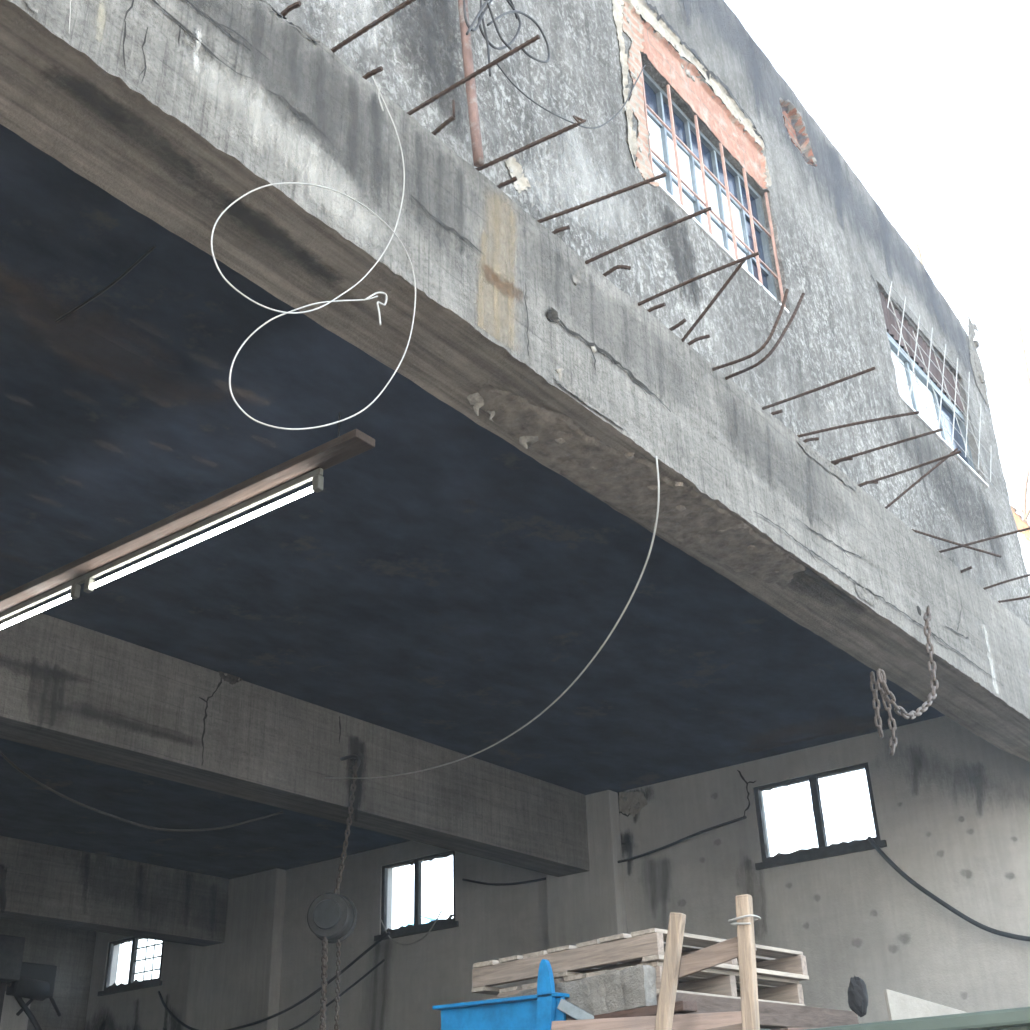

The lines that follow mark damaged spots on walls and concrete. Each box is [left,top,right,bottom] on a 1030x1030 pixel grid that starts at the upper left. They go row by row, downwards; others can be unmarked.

crack [123,0,333,145]
flaking render [536,0,772,234]
spalling [780,100,817,166]
rust [486,268,520,300]
spalling [573,206,712,286]
spalling [638,251,760,346]
spalling [556,376,627,429]
spalling [478,384,807,590]
crack [199,678,222,765]
crack [737,770,756,816]